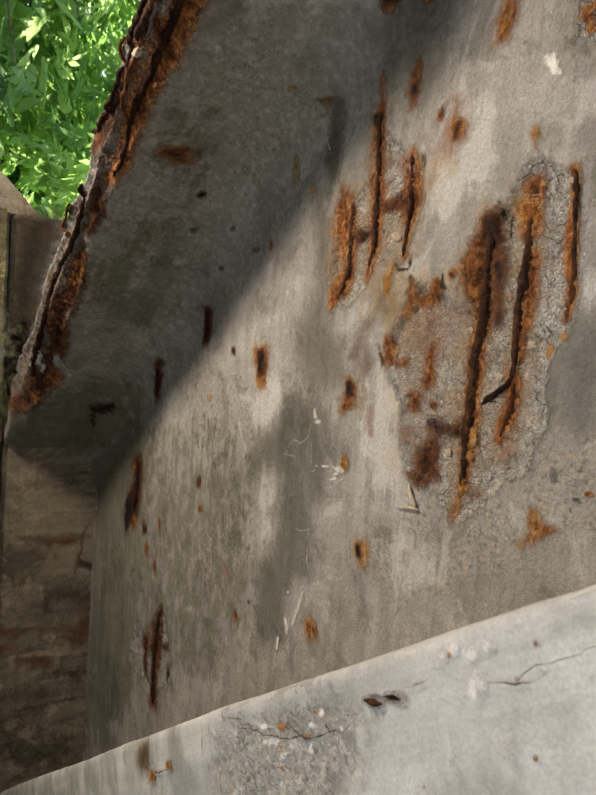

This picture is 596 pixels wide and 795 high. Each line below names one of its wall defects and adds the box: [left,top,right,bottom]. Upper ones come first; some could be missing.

rust [491,0,519,48]
spalling [576,0,596,41]
rust [405,57,424,111]
rust [158,145,197,165]
spalling [382,156,582,528]
rust [253,343,269,390]
crack [487,646,596,686]
spalling [215,686,408,795]